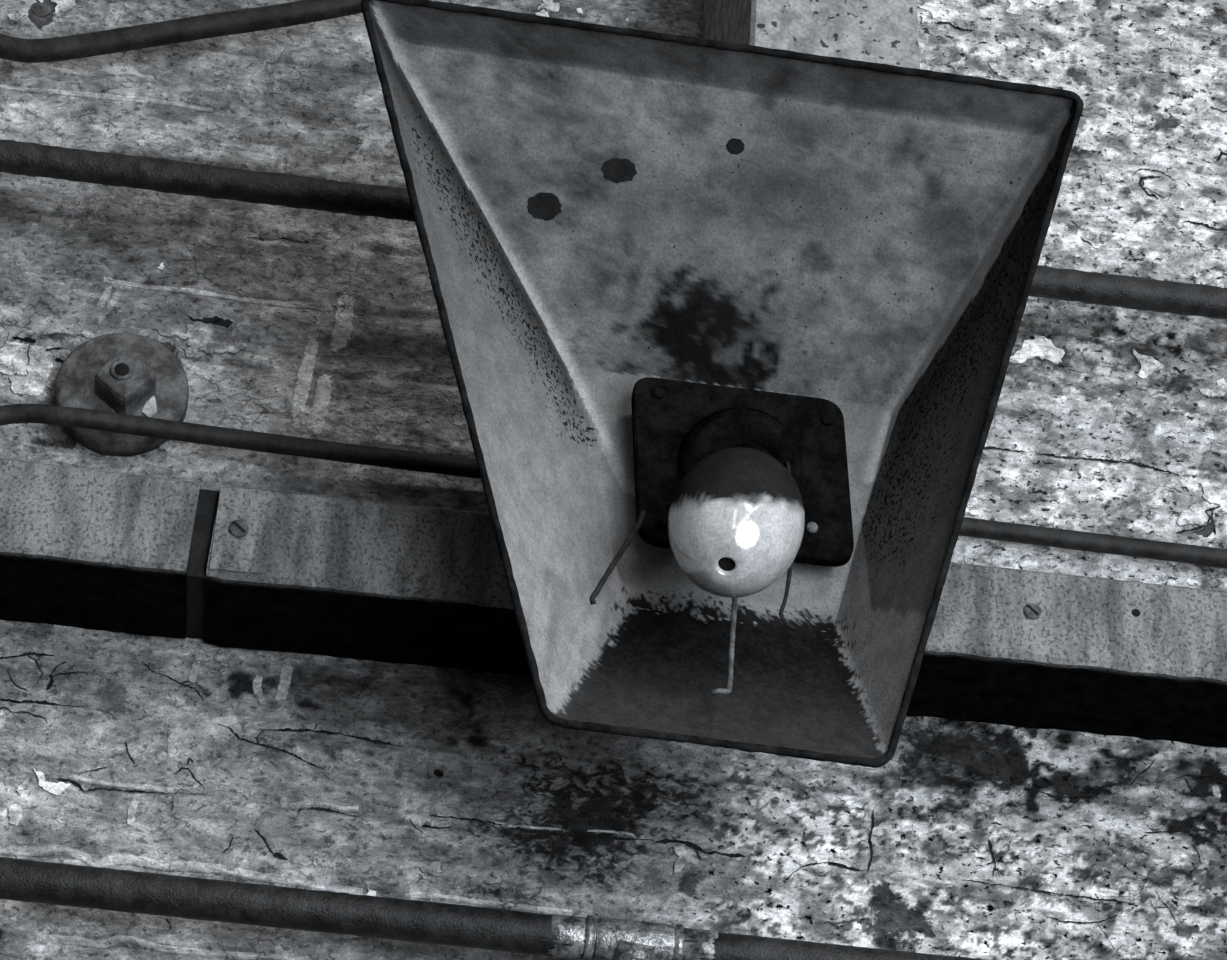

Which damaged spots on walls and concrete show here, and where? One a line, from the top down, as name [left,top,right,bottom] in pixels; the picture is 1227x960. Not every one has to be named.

spalling [8,0,77,30]
peeling [1009,335,1065,365]
peeling [1132,349,1165,380]
peeling [1198,378,1227,398]
crack [0,652,85,722]
crack [142,661,326,770]
crack [58,742,205,794]
leakage [897,725,1019,793]
leakage [469,749,716,887]
crack [223,829,288,860]
leakage [452,883,572,905]
leakage [679,873,700,897]